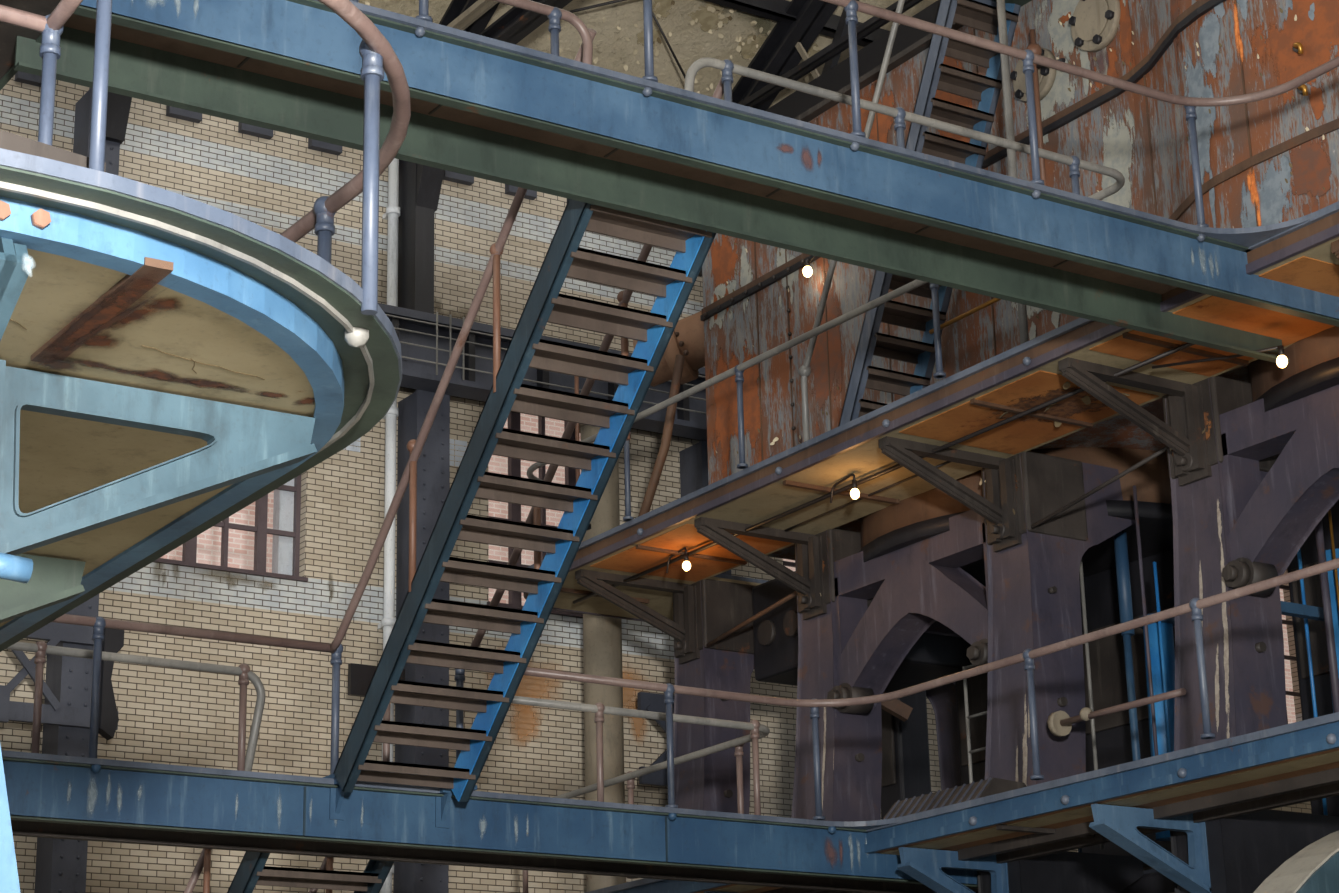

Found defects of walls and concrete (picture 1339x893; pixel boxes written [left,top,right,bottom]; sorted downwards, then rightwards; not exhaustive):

peeling [1280,0,1315,21]
peeling [1026,0,1108,144]
peeling [1097,109,1135,208]
peeling [1183,0,1247,228]
rust [1247,171,1261,226]
peeling [1240,155,1292,228]
rust [1233,0,1339,216]
peeling [776,247,799,308]
rust [33,278,315,405]